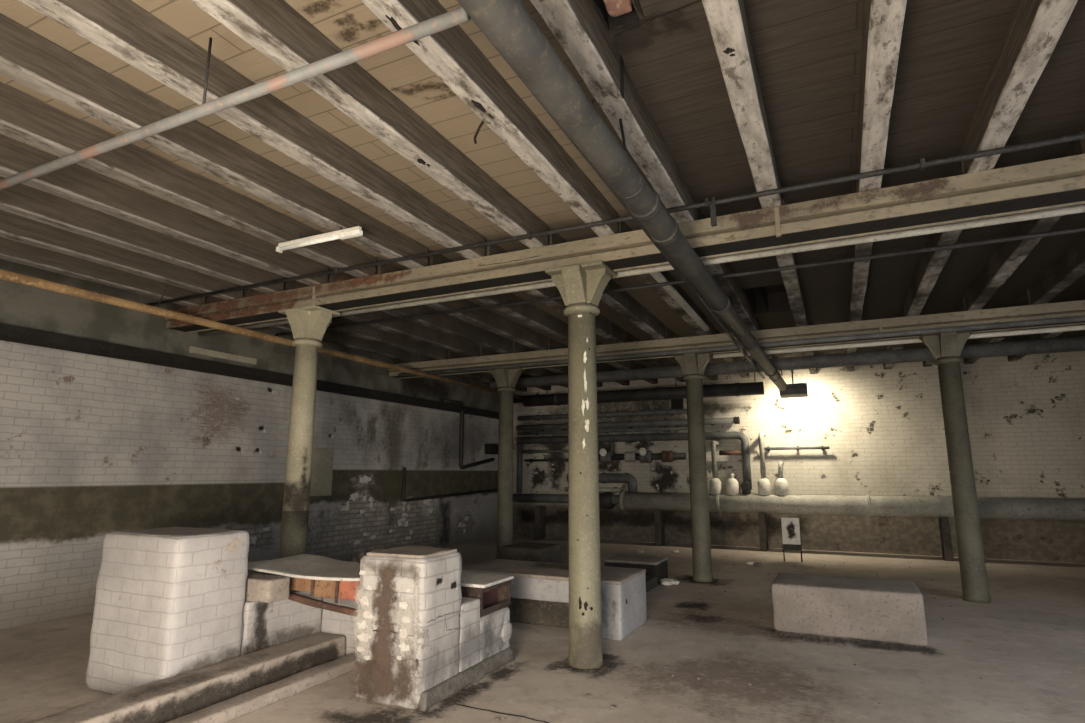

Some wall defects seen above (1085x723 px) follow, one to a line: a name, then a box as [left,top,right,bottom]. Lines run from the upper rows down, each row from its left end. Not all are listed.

corrosion [169,272,411,328]
leakage [352,647,385,701]
crack [457,704,548,723]